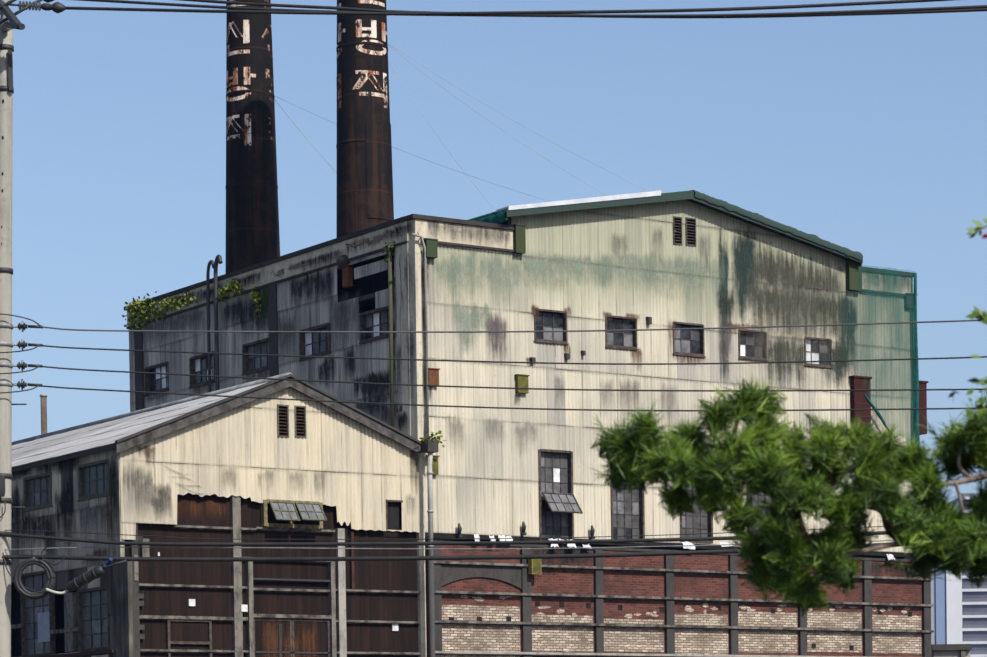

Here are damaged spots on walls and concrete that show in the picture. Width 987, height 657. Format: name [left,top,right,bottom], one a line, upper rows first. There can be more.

water stain [421,230,857,383]
water stain [318,322,431,431]
peeling [442,595,520,657]
peeling [532,603,922,655]